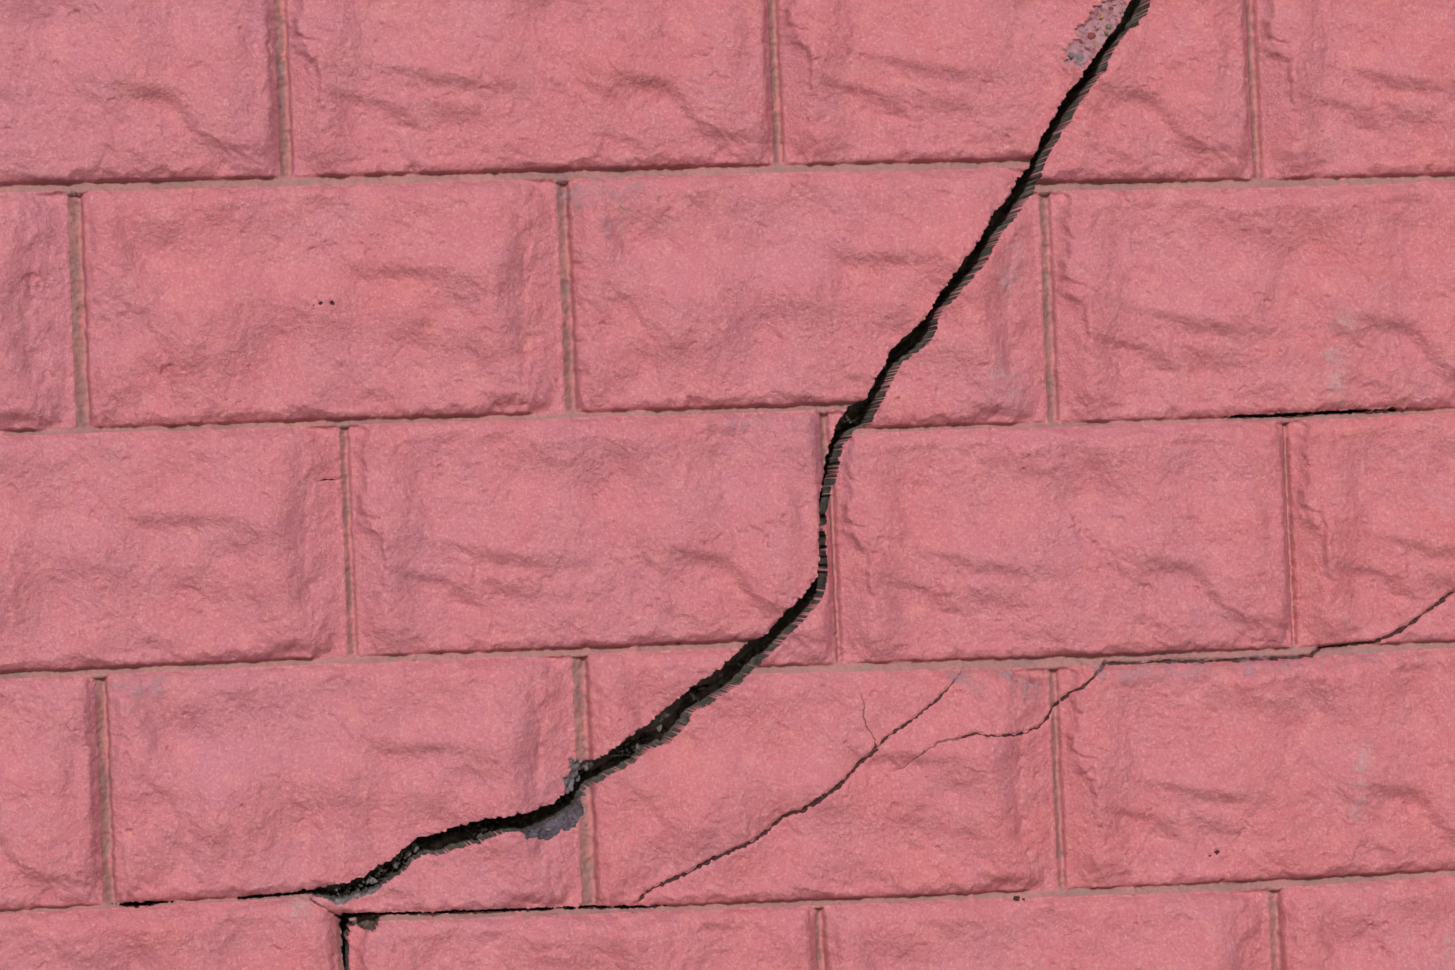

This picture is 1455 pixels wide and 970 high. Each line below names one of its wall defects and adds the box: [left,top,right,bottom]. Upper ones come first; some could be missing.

spalling [1062,0,1128,70]
crack [238,0,1150,970]
crack [896,591,1455,770]
spalling [525,757,601,840]
crack [111,900,173,908]